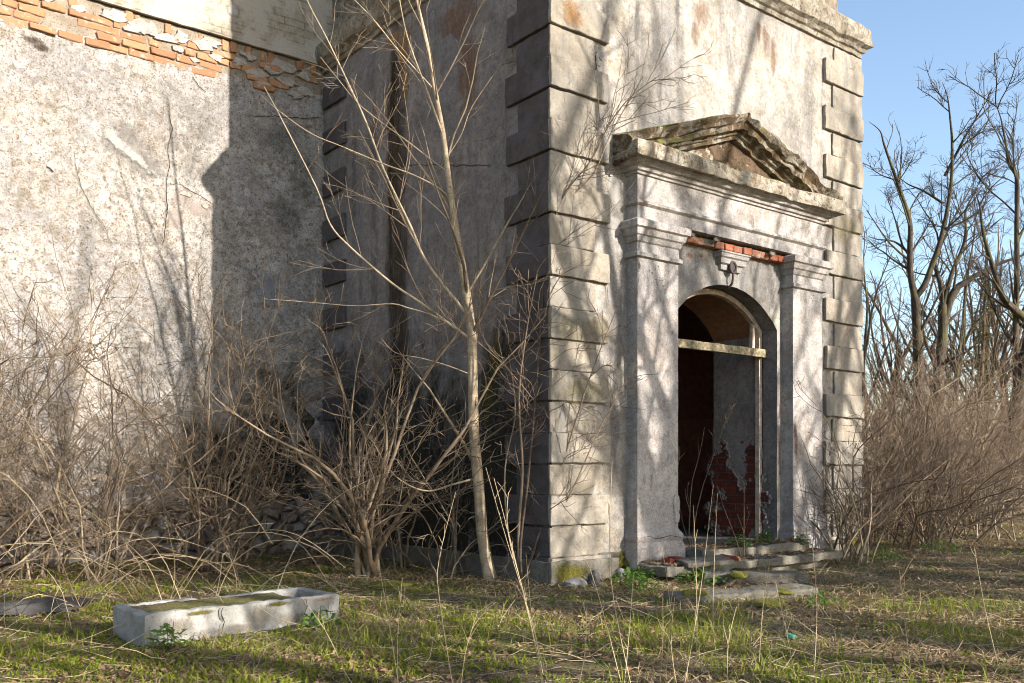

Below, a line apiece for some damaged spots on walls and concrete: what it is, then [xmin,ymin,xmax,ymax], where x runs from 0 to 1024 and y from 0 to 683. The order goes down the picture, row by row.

spalling [0,0,321,100]
spalling [708,141,776,180]
spalling [704,439,772,538]